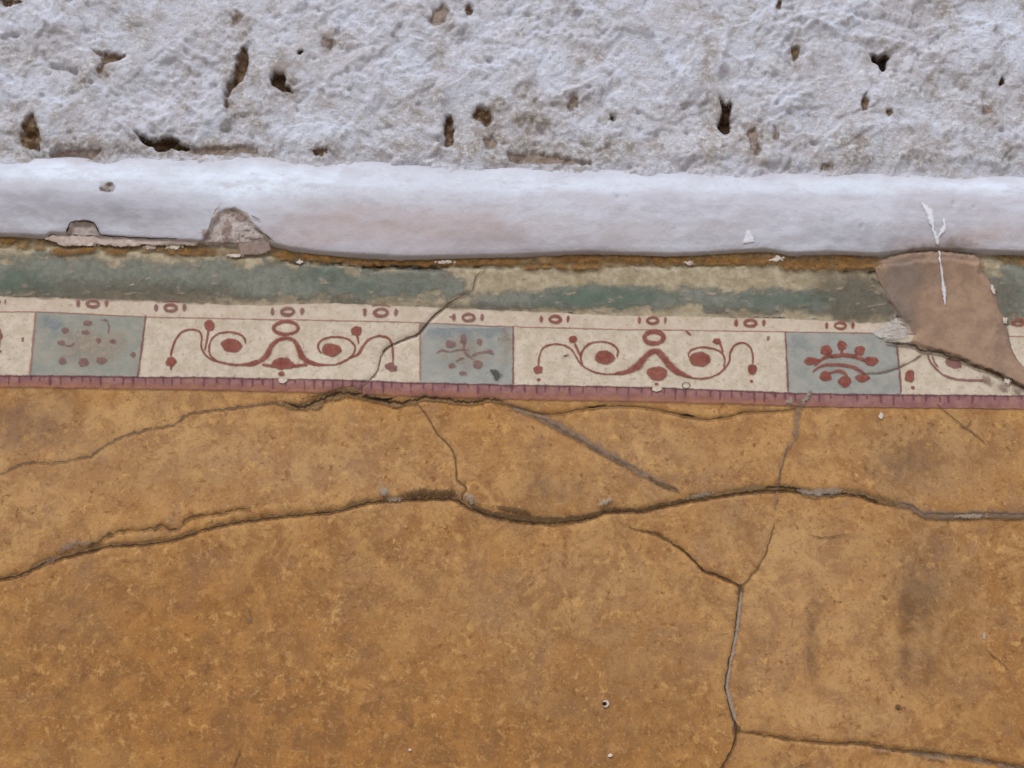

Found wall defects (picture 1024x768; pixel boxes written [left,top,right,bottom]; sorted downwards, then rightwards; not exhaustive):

spalling [44,206,275,255]
peeling [873,318,908,340]
crack [0,270,1024,768]